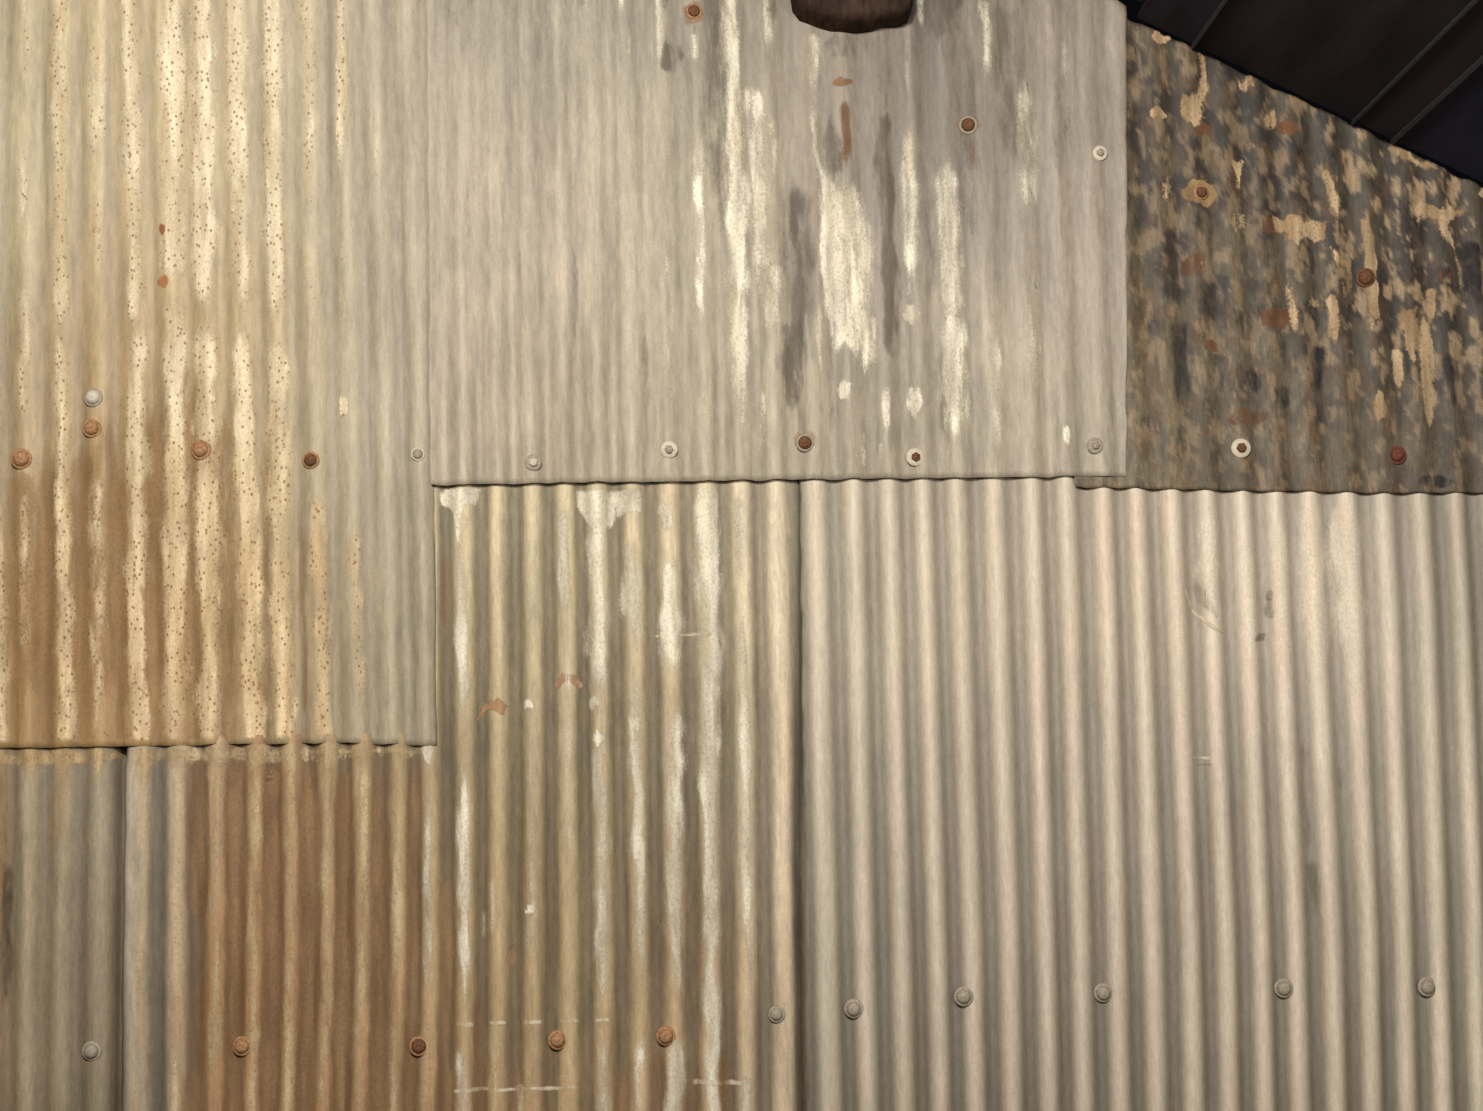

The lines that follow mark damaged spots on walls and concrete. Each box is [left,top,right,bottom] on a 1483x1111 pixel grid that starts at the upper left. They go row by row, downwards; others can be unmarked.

leakage [662,44,683,70]
peeling [1152,30,1171,44]
peeling [1150,53,1209,127]
leakage [875,118,894,215]
peeling [1232,160,1244,188]
peeling [1388,147,1436,170]
leakage [784,196,809,398]
leakage [883,247,892,341]
peeling [1273,170,1379,343]
peeling [1414,200,1464,288]
peeling [1373,288,1437,426]
corrosion [226,770,354,1111]